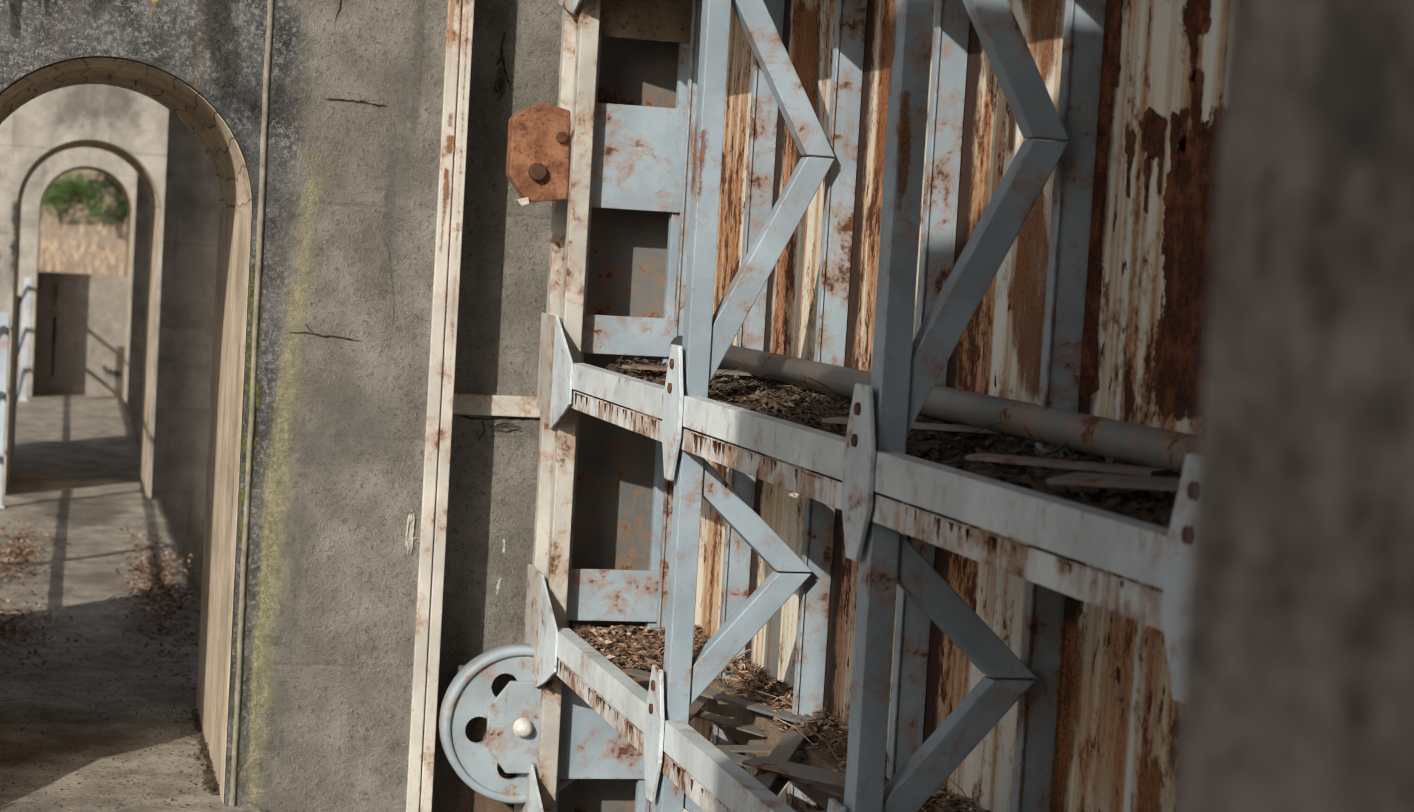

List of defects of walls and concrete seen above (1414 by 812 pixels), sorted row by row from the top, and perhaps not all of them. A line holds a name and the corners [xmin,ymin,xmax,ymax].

leakage [9,0,22,37]
rust [1021,0,1058,84]
crack [321,98,386,107]
rust [440,0,468,248]
rust [1008,108,1030,152]
rust [1079,0,1223,426]
rust [1009,191,1049,399]
rust [575,393,659,432]
rust [691,433,777,475]
leakage [250,469,272,753]
rust [1053,621,1085,812]
rust [1131,756,1161,812]